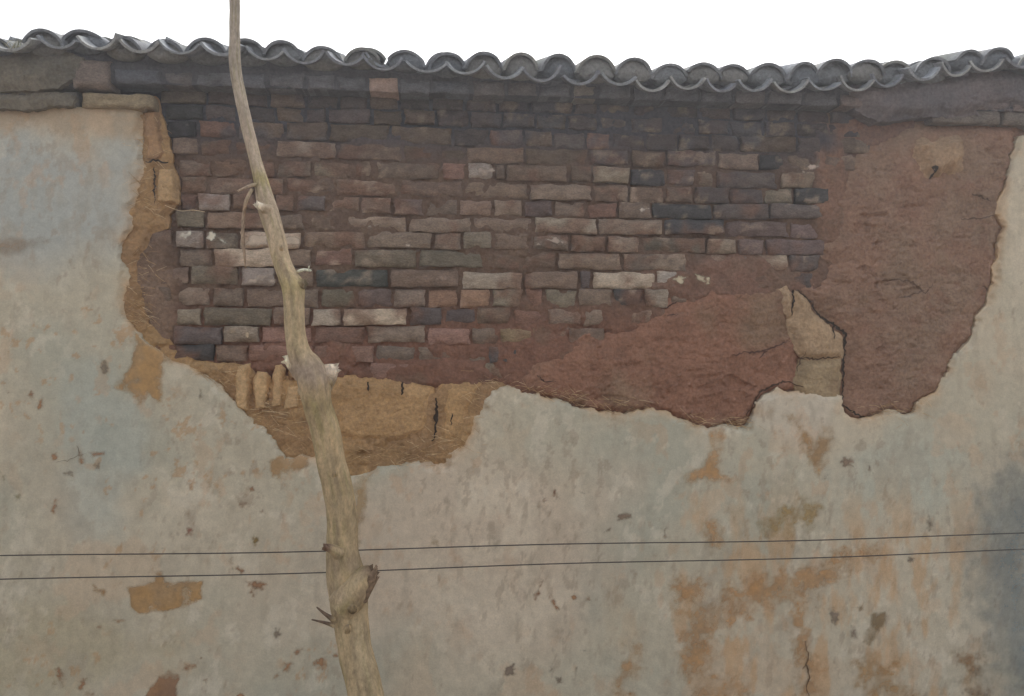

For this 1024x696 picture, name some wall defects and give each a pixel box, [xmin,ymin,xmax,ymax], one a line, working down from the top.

spalling [118,91,1024,476]
crack [732,290,869,418]
crack [431,398,453,441]